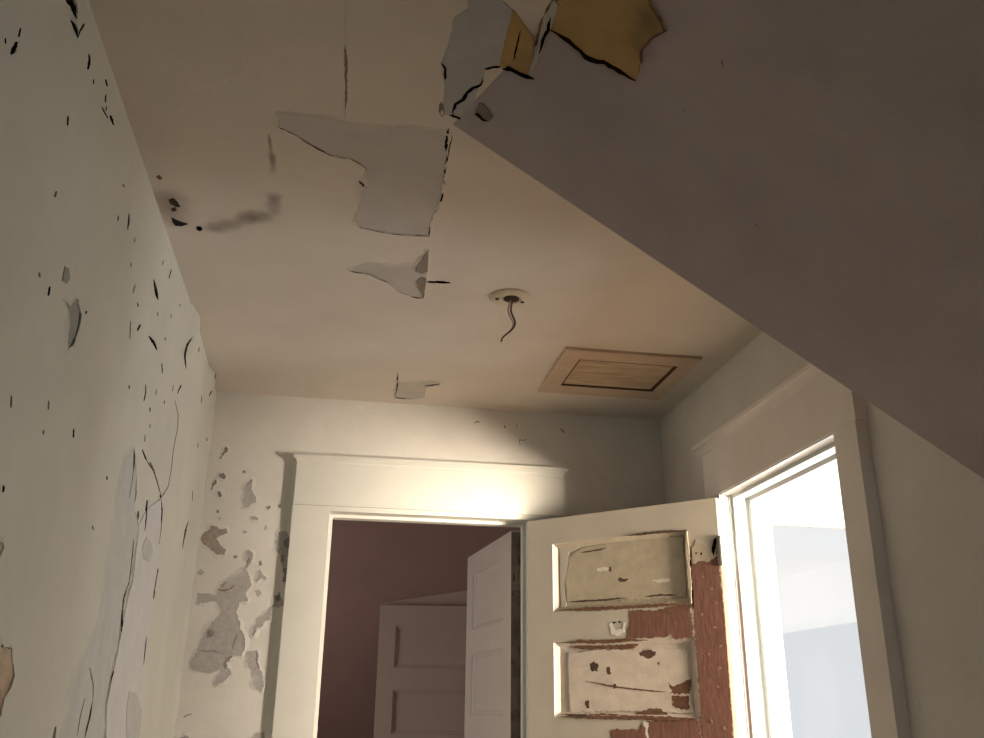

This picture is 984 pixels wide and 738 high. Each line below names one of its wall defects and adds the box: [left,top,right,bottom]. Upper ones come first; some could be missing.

peeling [87,54,114,125]
crack [342,0,350,119]
peeling [62,266,70,284]
peeling [62,295,87,358]
peeling [53,424,163,738]
peeling [188,443,290,695]
peeling [0,633,15,719]